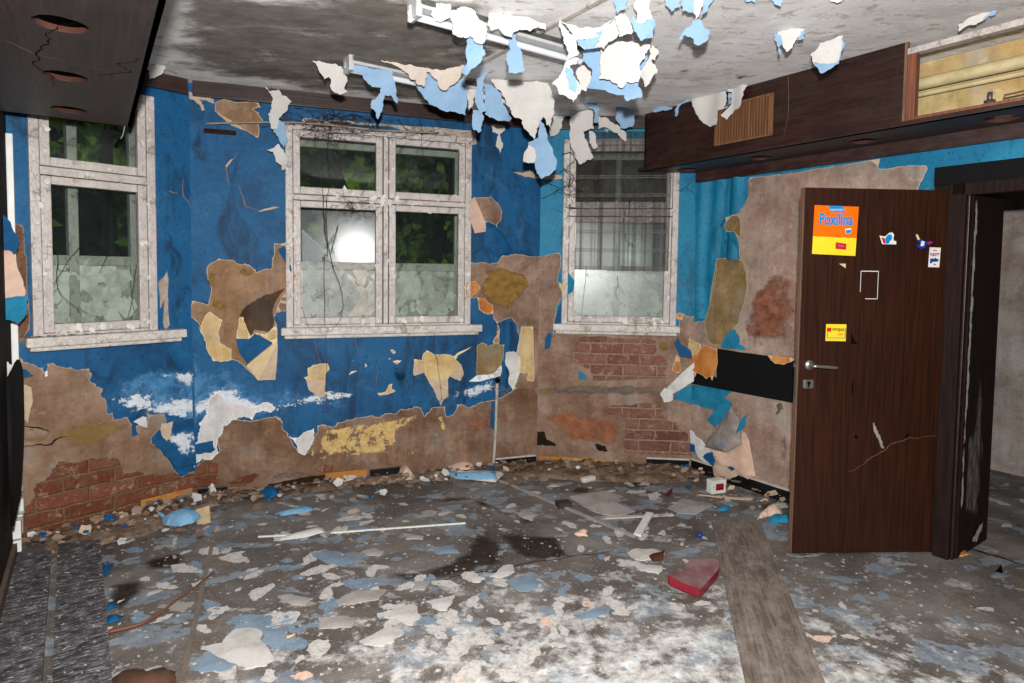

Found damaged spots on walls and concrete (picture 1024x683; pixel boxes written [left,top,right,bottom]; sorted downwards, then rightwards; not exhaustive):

crack [32,23,78,86]
peeling [665,0,713,46]
peeling [774,28,806,53]
peeling [811,36,845,73]
peeling [301,0,659,179]
peeling [653,76,748,127]
flaking render [16,159,928,542]
crack [24,426,67,447]